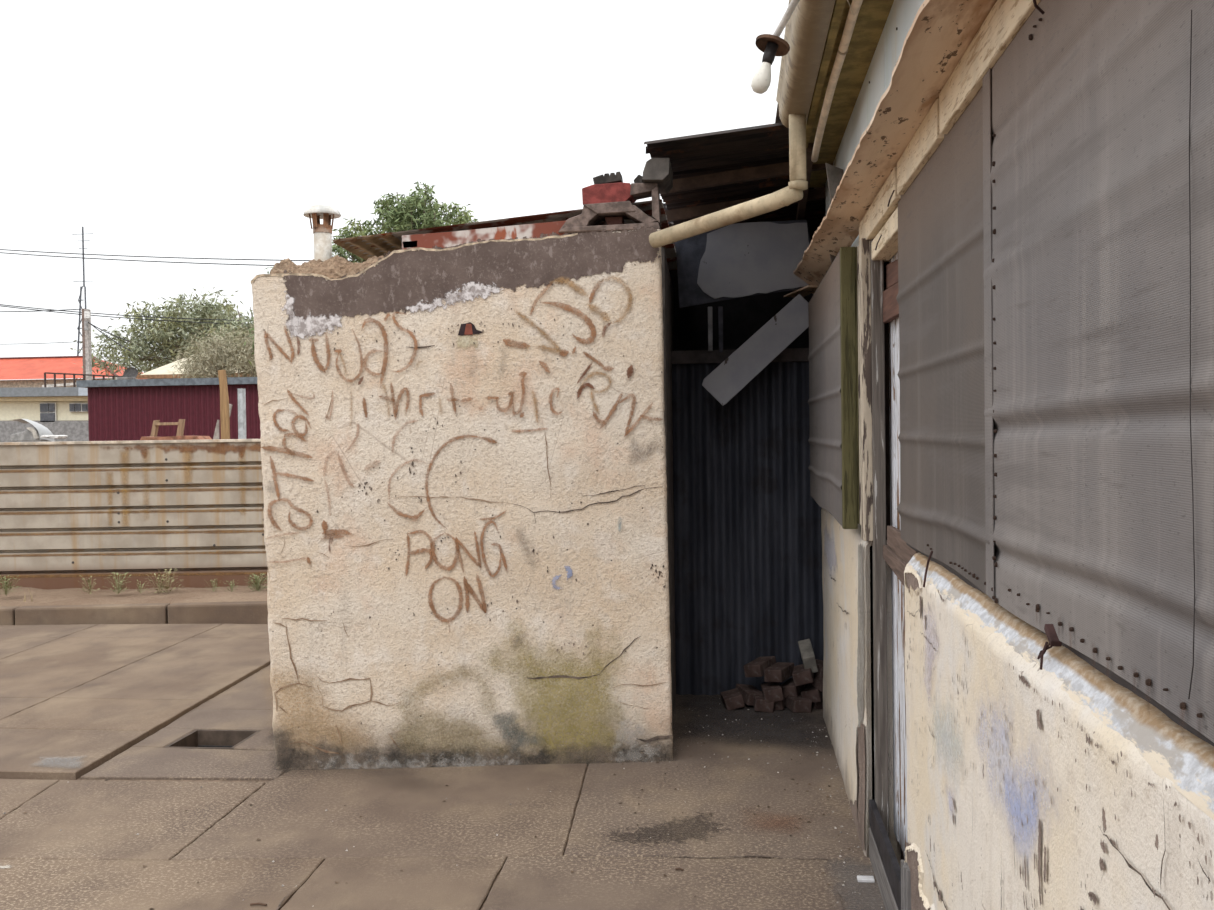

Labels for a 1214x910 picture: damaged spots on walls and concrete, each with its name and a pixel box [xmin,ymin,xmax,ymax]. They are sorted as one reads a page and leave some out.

peeling [251,226,661,350]
crack [393,435,657,522]
crack [274,618,400,754]
crack [529,637,666,709]
crack [636,735,672,744]
spalling [850,543,865,851]
peeling [1009,663,1098,754]
peeling [904,842,935,910]
peeling [1019,818,1046,910]
peeling [1099,839,1116,871]
crack [1099,799,1170,910]
peeling [1148,783,1210,885]